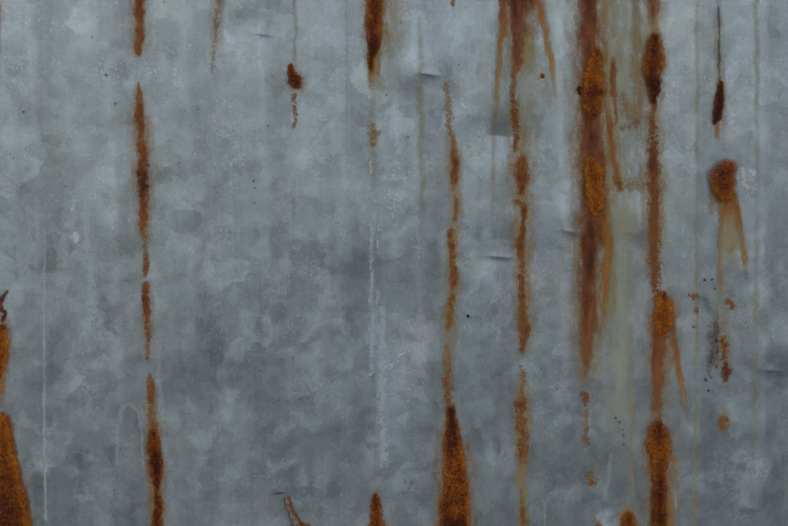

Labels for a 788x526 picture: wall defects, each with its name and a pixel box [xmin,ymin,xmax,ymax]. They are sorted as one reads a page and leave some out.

rust [0,291,10,395]
rust [135,82,152,361]
rust [365,0,397,81]
rust [444,81,459,330]
rust [495,0,555,353]
rust [575,0,623,366]
rust [641,0,686,526]
rust [712,80,725,135]
rust [704,159,747,290]
rust [0,412,32,526]
rust [146,374,164,526]
rust [436,344,471,526]